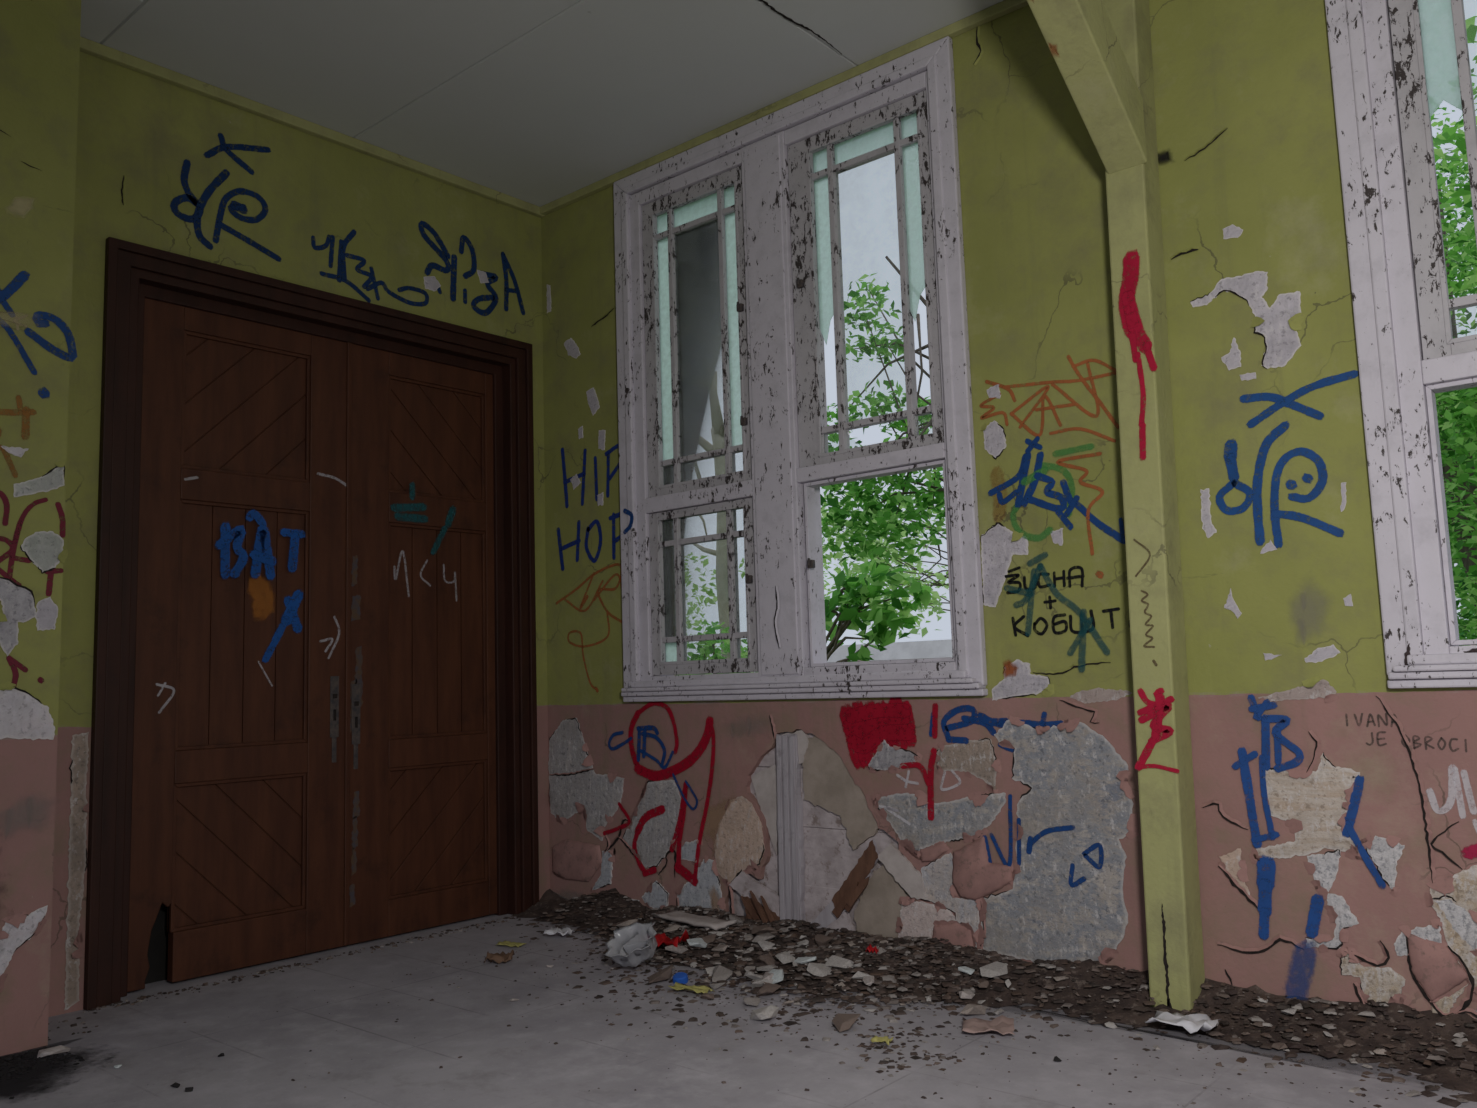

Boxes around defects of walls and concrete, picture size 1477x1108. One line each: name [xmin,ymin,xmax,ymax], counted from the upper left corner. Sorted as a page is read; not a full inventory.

crack [756,0,842,55]
peeling [1190,271,1306,381]
peeling [0,577,58,656]
peeling [0,681,89,1010]
flaking render [548,718,765,911]
flaking render [867,659,1139,965]
crack [1202,800,1249,830]
crack [1217,865,1304,984]
crack [1307,730,1321,773]
flaking render [1218,752,1477,1013]
crack [1344,936,1477,1018]
crack [1376,694,1462,883]